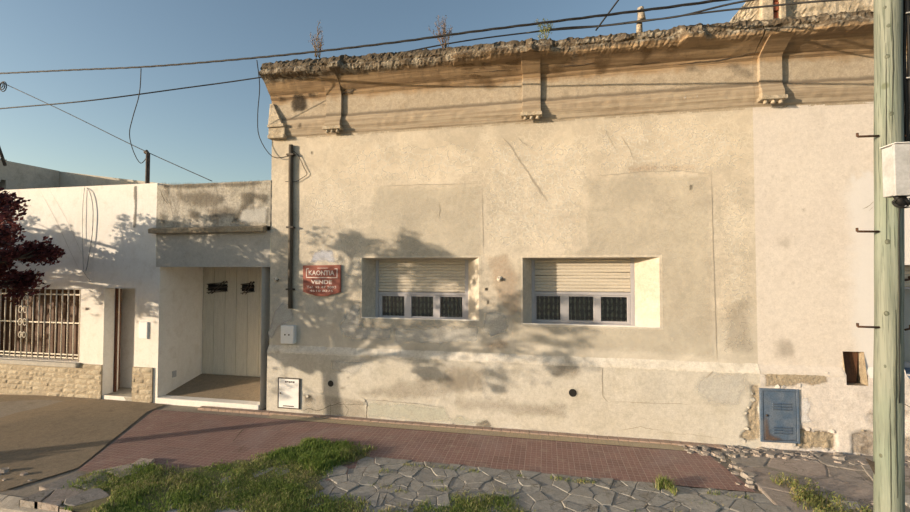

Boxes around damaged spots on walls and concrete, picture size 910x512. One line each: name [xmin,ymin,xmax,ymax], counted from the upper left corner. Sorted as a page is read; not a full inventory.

crack [392,183,483,218]
crack [503,137,548,202]
crack [307,200,359,273]
crack [597,130,717,378]
flaking render [739,372,829,443]
spalling [791,427,835,451]
spalling [853,430,873,455]